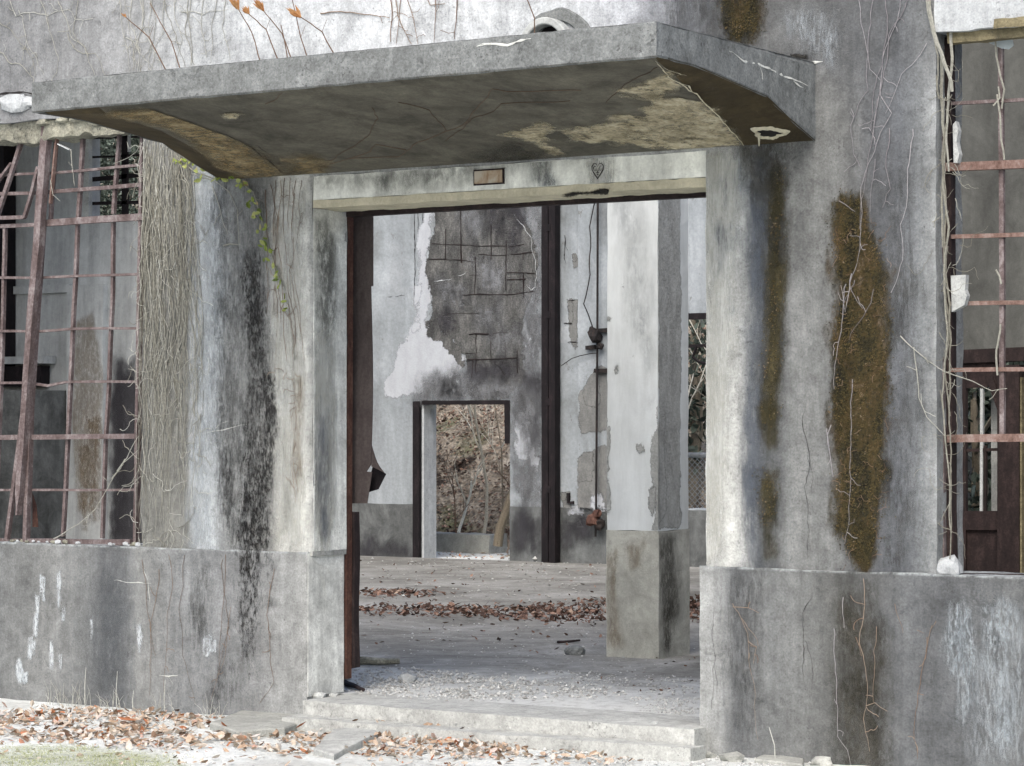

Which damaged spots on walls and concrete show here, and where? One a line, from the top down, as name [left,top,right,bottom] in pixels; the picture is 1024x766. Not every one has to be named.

water stain [223,197,334,574]
spalling [411,208,539,400]
peeling [561,365,618,516]
water stain [832,310,853,448]